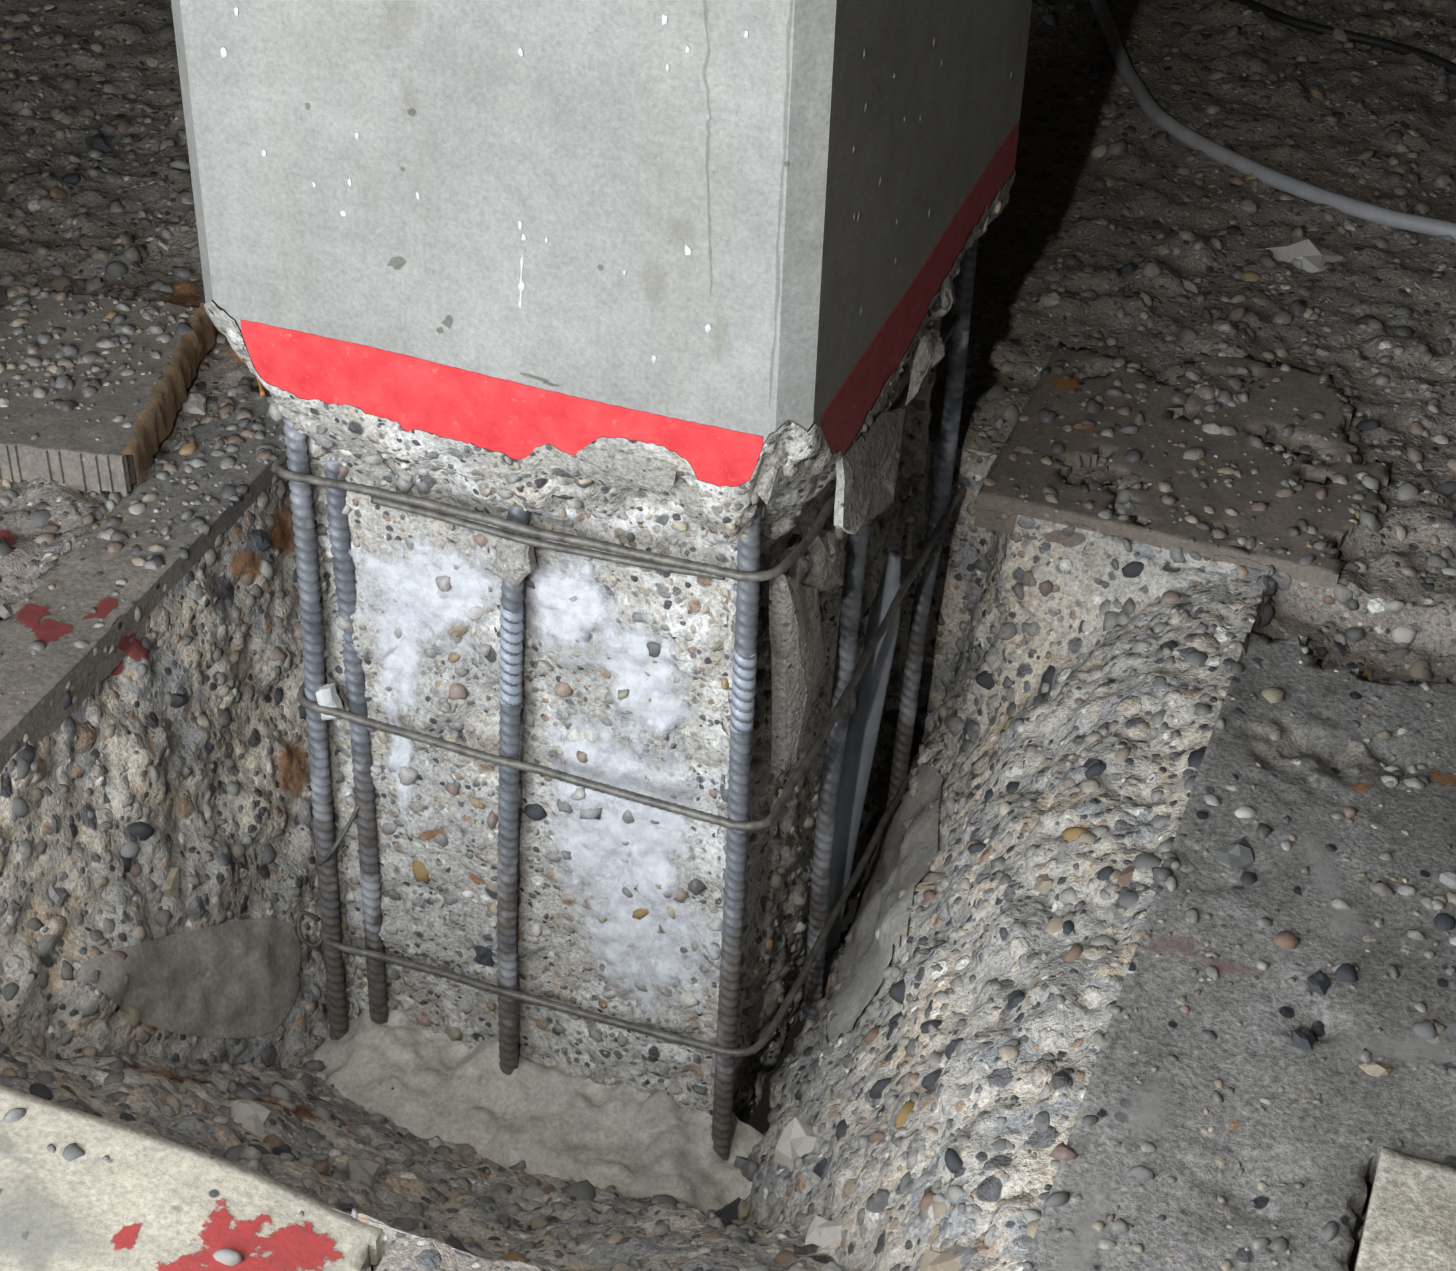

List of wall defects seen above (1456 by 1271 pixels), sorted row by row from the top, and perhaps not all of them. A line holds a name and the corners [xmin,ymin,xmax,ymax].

water stain [352,536,499,811]
water stain [524,563,720,1008]
spalling [0,170,1272,1271]